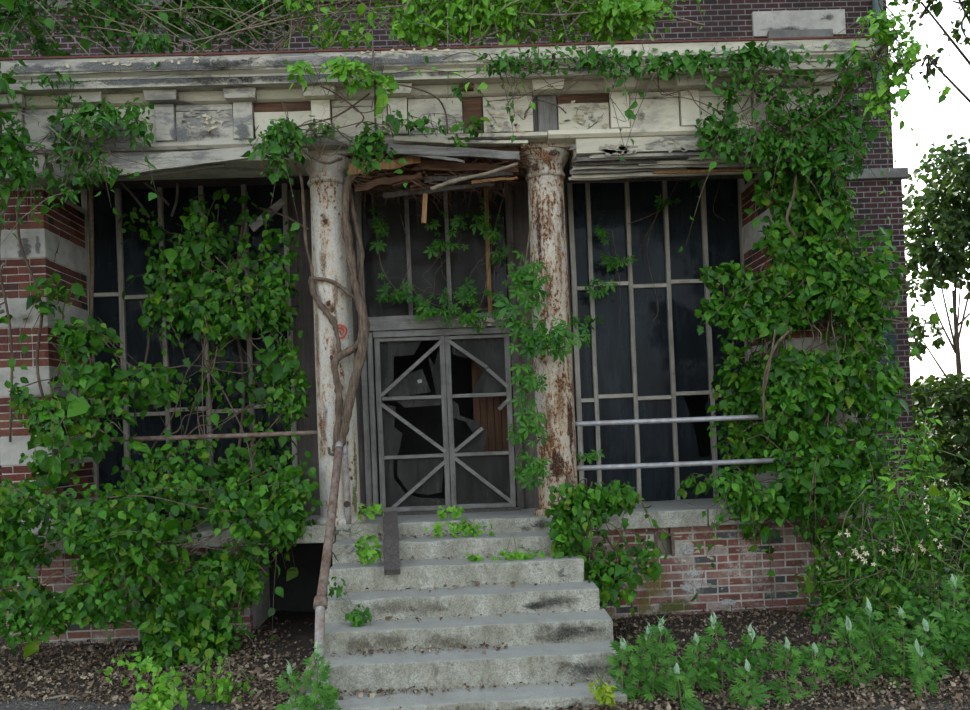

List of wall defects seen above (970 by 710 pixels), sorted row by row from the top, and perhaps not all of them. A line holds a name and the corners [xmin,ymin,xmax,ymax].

peeling [357,48,456,58]
peeling [558,100,608,128]
corrosion [536,188,564,309]
corrosion [546,379,573,481]